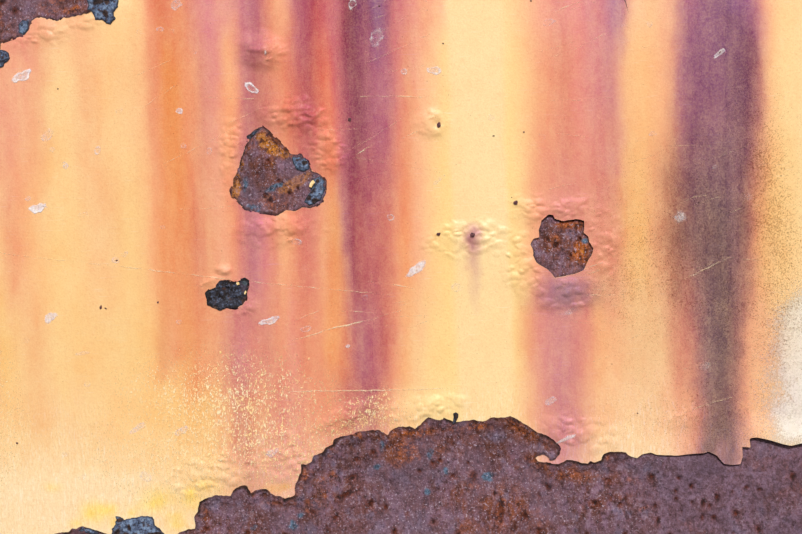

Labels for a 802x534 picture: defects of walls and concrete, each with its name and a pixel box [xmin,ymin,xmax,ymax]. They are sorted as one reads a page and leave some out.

peeling [0,0,119,67]
corrosion [342,0,367,206]
peeling [229,125,327,216]
peeling [531,215,593,278]
corrosion [677,14,757,451]
peeling [205,278,249,310]
peeling [98,351,802,534]
peeling [56,516,164,534]